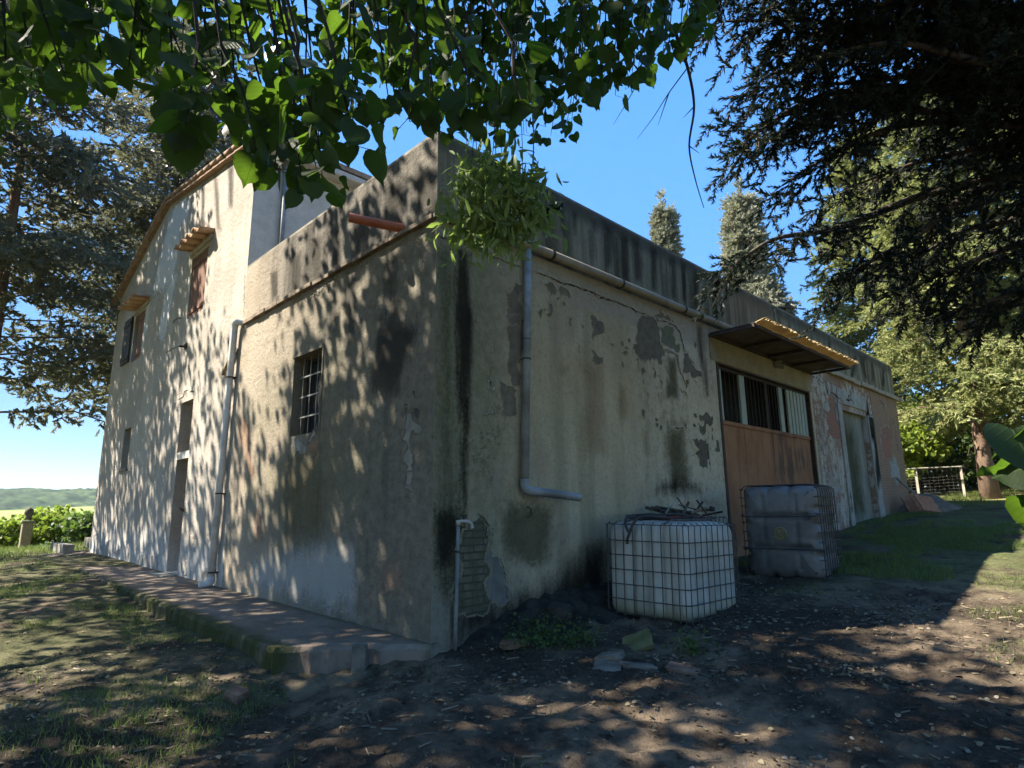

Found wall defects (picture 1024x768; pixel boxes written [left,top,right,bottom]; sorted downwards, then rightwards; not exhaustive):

crack [438,230,696,397]
peeling [537,281,703,399]
leakage [436,250,473,587]
peeling [641,408,721,471]
peeling [450,516,511,618]